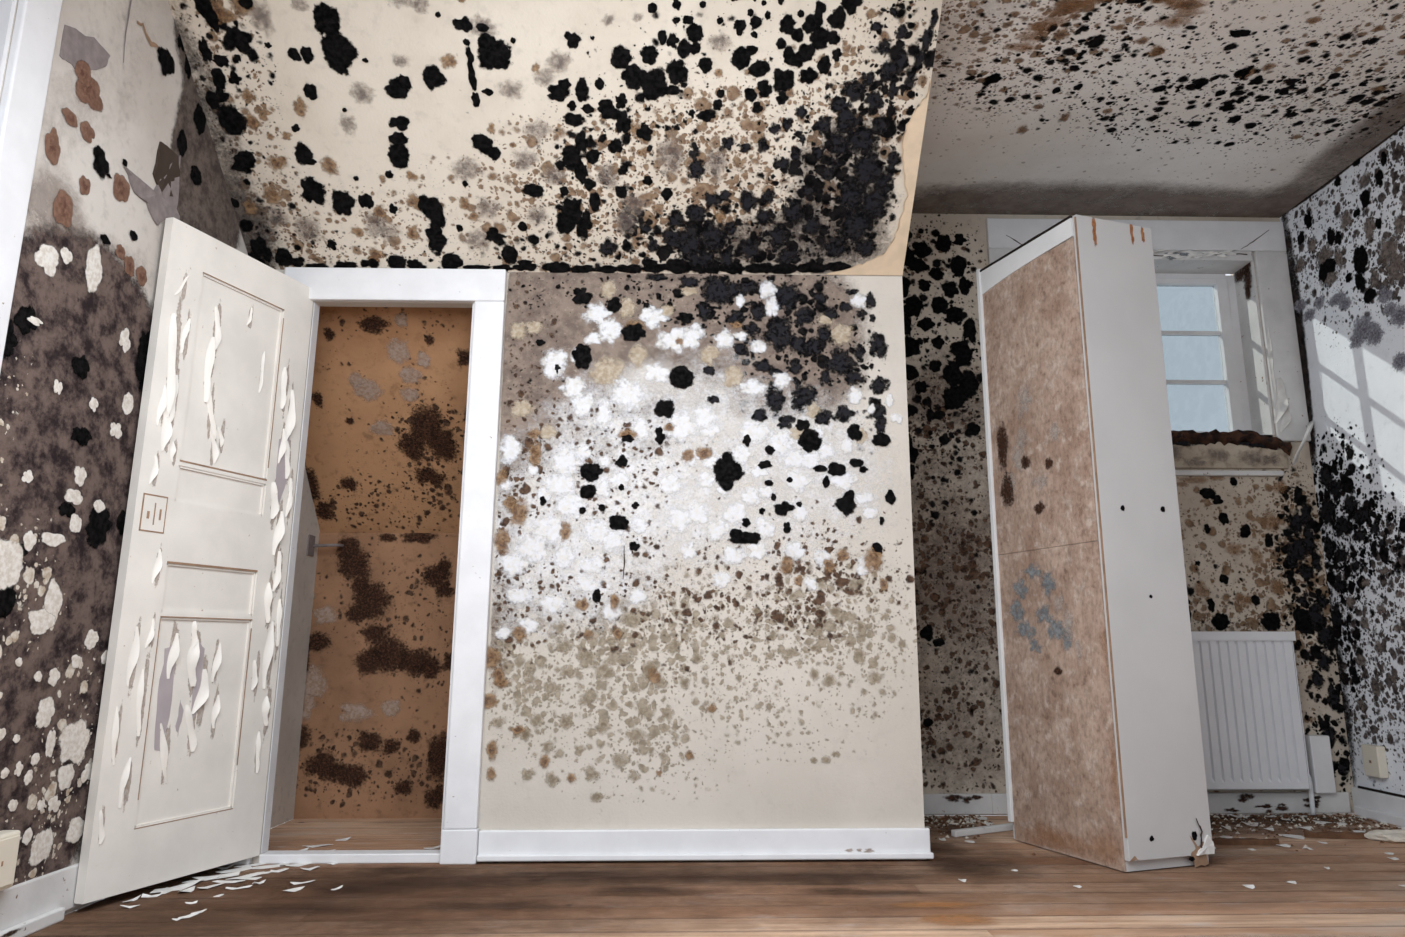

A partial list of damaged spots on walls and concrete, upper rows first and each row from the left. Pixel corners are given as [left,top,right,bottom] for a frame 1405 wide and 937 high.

damp [0,60,153,886]
peeling [154,642,205,751]
peeling [276,436,290,504]
damp [157,0,1405,814]